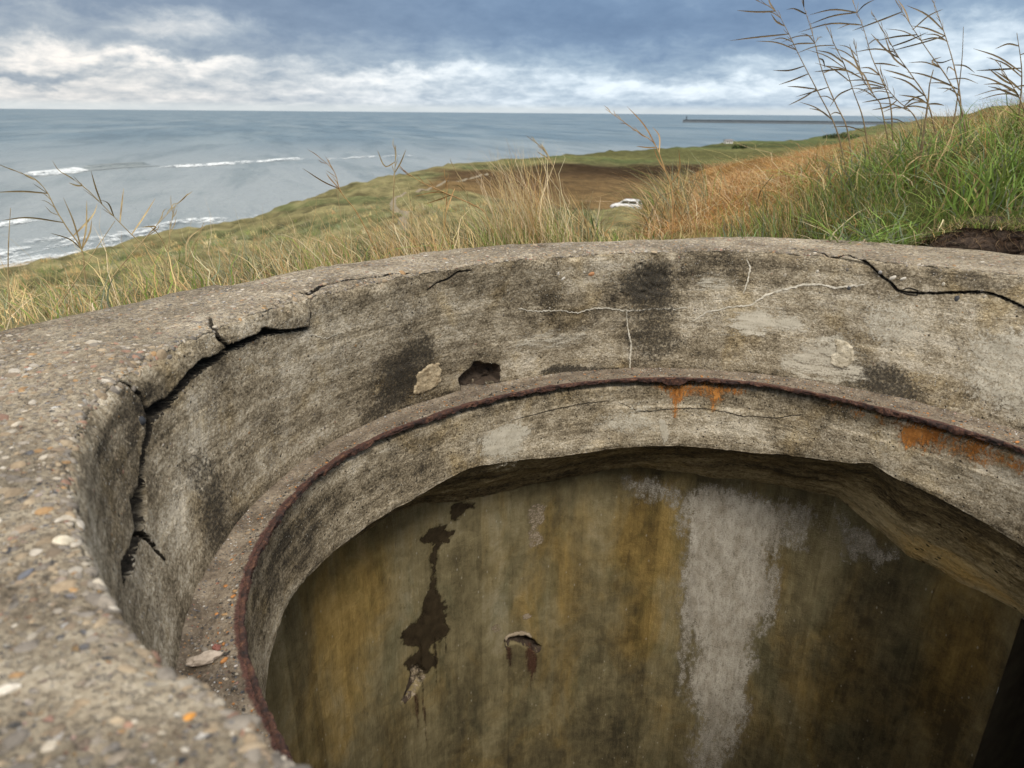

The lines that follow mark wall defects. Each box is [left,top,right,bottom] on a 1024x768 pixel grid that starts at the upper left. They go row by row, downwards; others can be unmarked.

crack [121,270,470,583]
leakage [400,502,475,686]
spalling [0,238,1024,768]
leakage [619,265,689,363]
rust [659,381,746,417]
leakage [624,476,818,768]
crack [520,248,1023,368]
rust [854,407,1024,474]